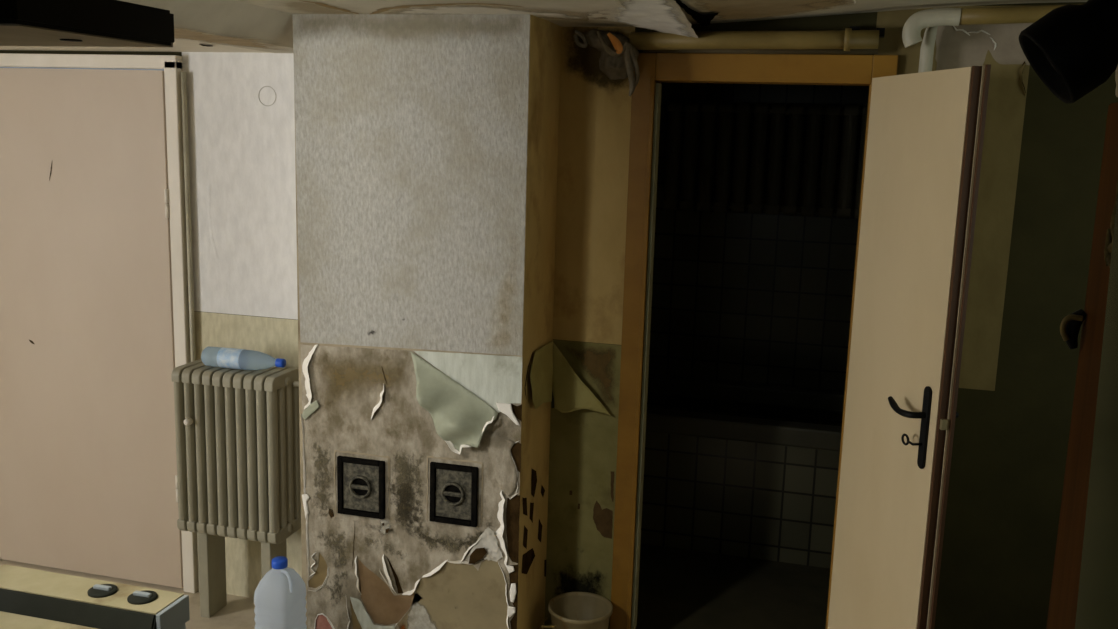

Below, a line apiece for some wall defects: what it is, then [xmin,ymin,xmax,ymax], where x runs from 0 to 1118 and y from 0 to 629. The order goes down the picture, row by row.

peeling [301,414,329,592]
flaking render [314,431,547,629]